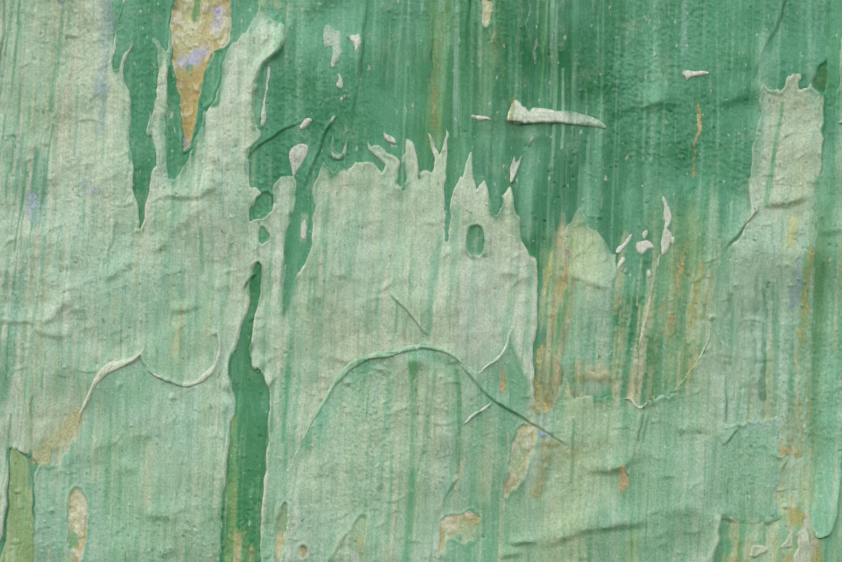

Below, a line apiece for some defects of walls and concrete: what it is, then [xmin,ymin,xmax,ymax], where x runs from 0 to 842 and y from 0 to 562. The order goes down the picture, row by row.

peeling [0,0,308,562]
peeling [260,67,825,562]
crack [753,0,788,75]
peeling [781,235,842,562]
peeling [828,76,842,213]